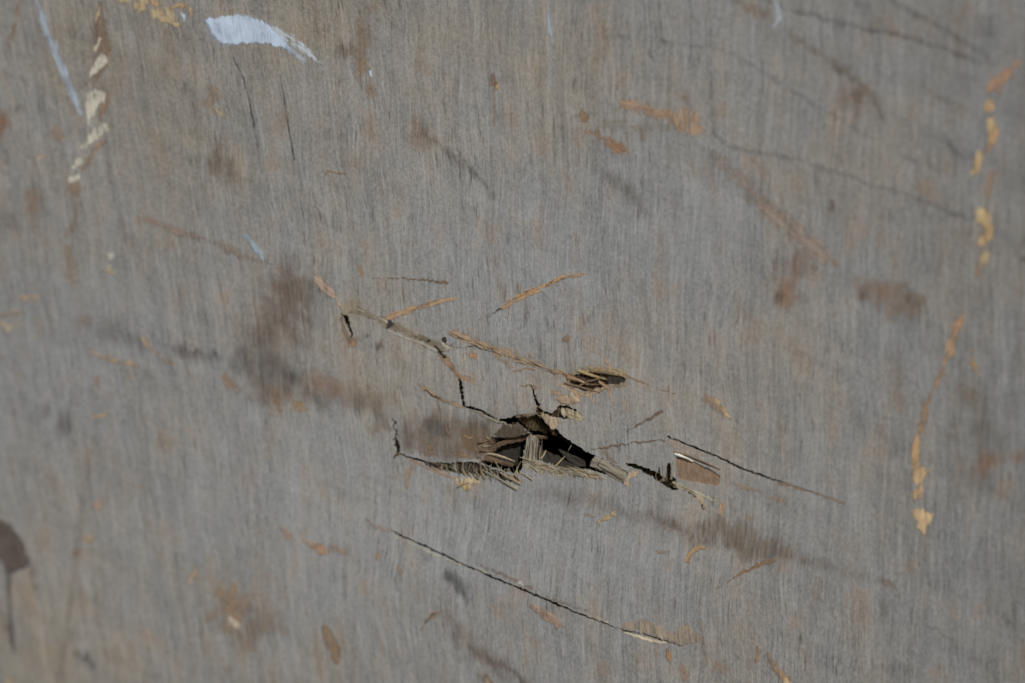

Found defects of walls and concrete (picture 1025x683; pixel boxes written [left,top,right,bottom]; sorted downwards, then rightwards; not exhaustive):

peeling [117,0,193,27]
peeling [68,2,114,184]
peeling [971,61,1022,275]
crack [340,299,485,408]
crack [392,393,467,489]
crack [530,385,544,414]
crack [627,436,811,516]
peeling [911,313,964,535]
crack [375,526,680,646]